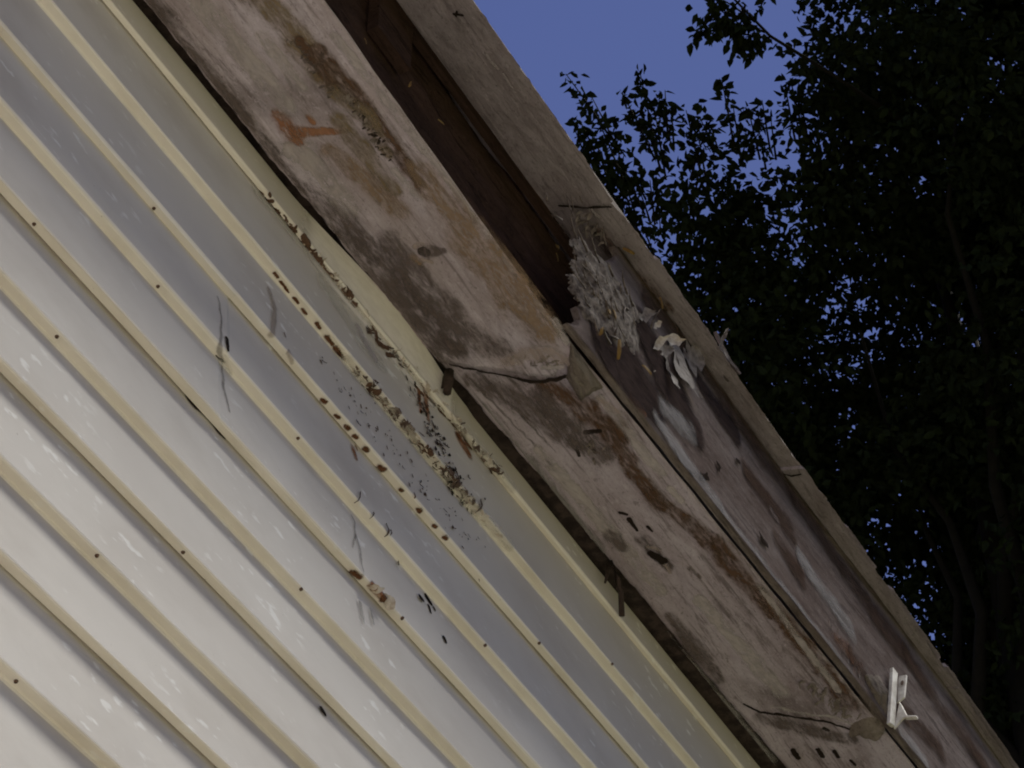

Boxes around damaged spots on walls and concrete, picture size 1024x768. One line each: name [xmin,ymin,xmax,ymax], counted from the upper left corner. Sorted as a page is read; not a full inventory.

corrosion [272,110,343,146]
damp [146,0,558,365]
corrosion [333,414,369,460]
peeling [259,191,504,549]
corrosion [456,432,482,460]
crack [449,364,567,462]
peeling [639,307,705,399]
peeling [713,328,741,382]
damp [463,373,859,711]
damp [697,364,989,768]